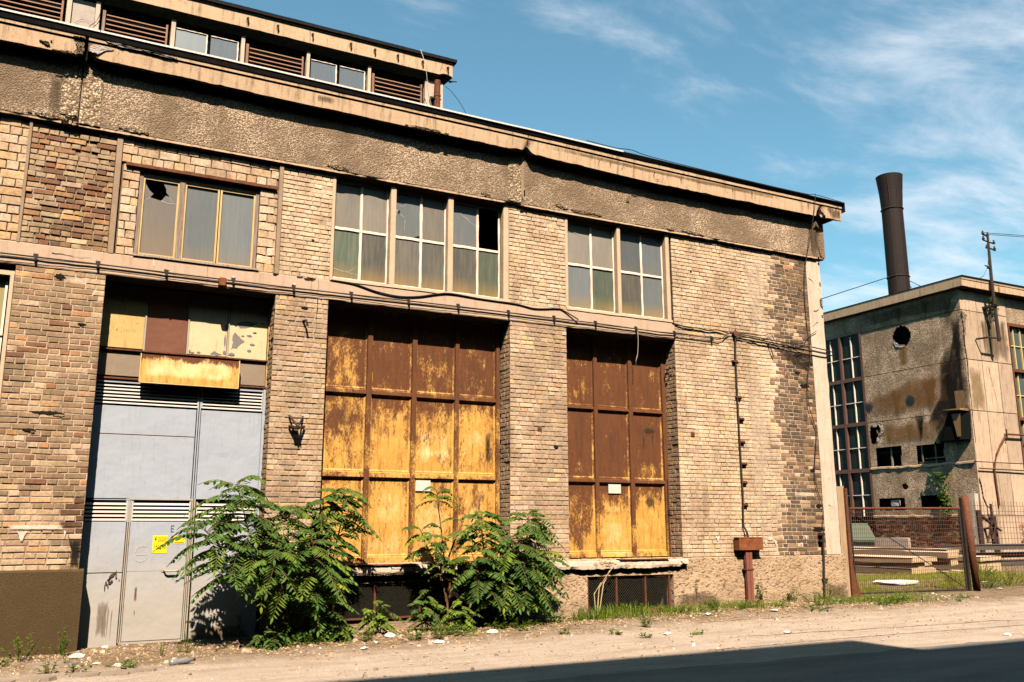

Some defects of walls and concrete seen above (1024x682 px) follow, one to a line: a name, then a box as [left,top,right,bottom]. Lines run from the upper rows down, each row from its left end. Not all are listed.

peeling [189,322,264,356]